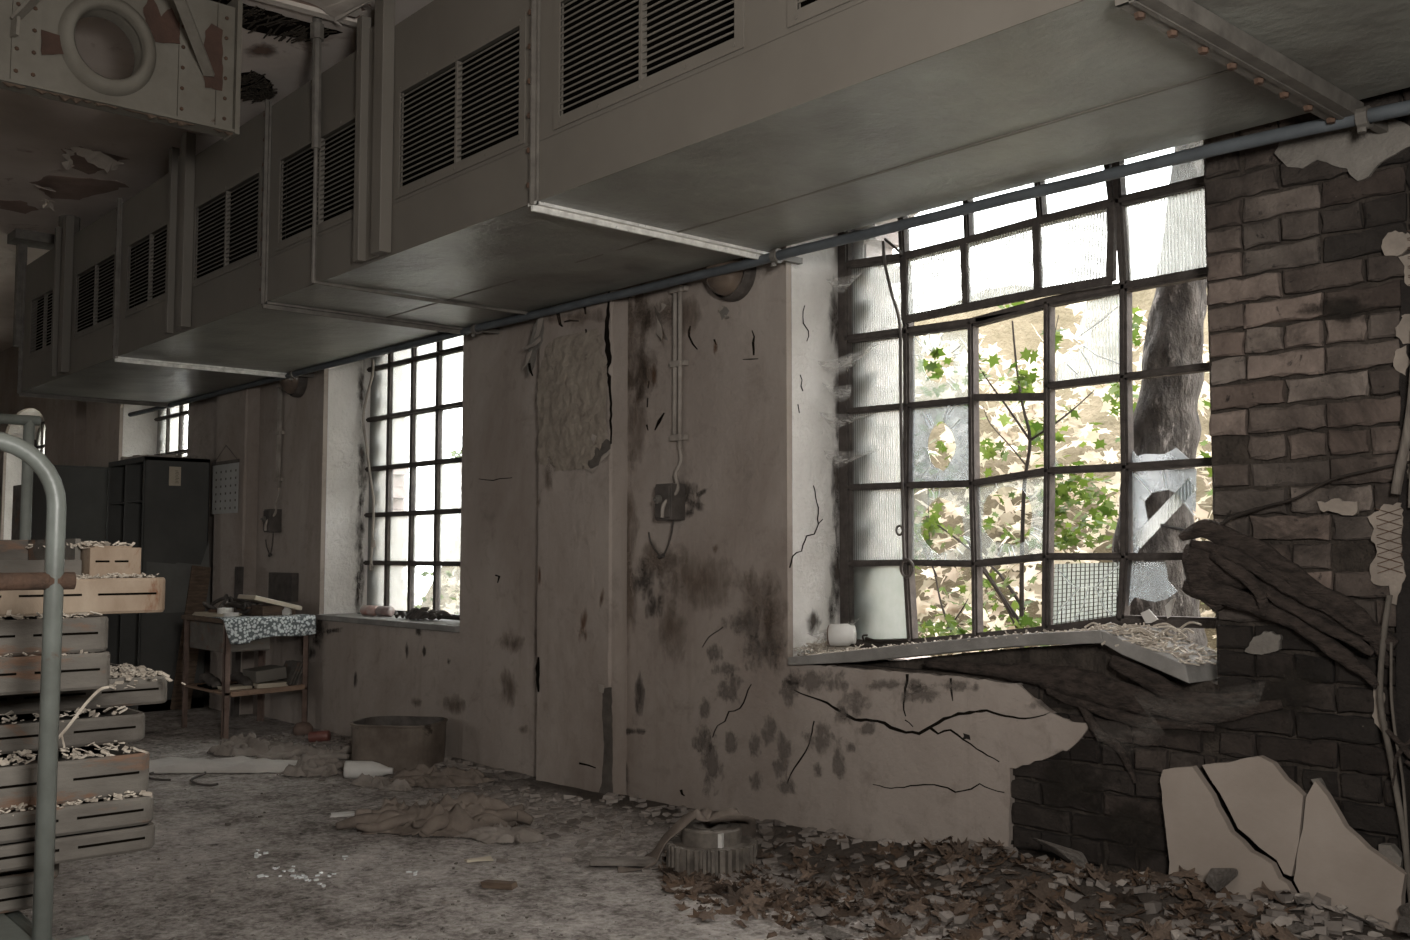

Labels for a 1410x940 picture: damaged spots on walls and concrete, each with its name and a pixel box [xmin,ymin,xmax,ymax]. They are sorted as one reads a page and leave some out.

peeling [291,0,375,27]
water stain [628,296,689,427]
water stain [627,504,714,636]
crack [789,486,823,568]
water stain [808,537,840,633]
water stain [694,646,794,793]
water stain [782,672,977,776]
crack [788,674,1050,793]